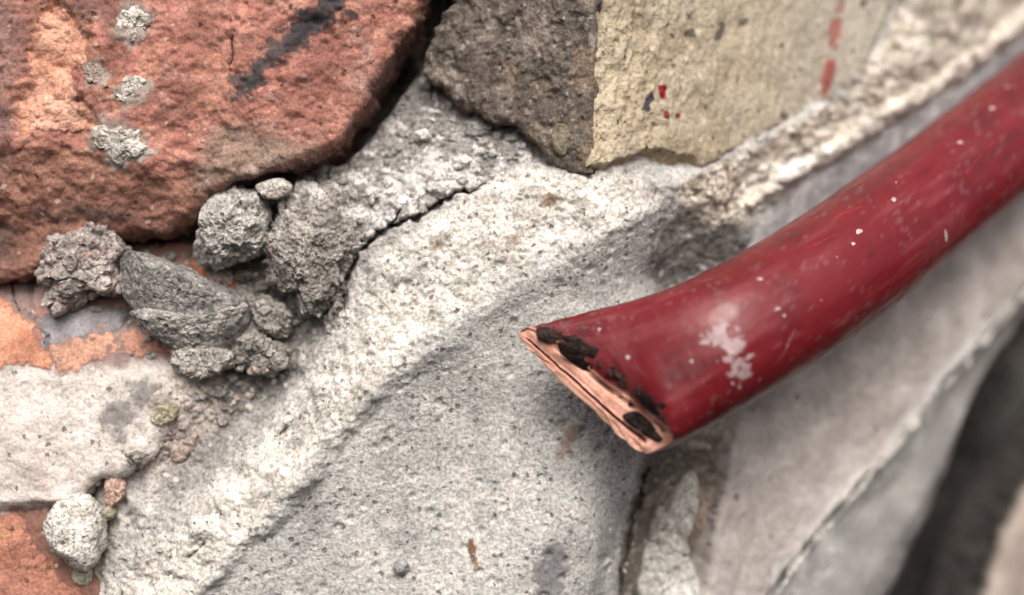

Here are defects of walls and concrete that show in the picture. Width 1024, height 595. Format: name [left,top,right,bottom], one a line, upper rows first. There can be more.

crack [343,189,474,310]
spalling [0,295,171,376]